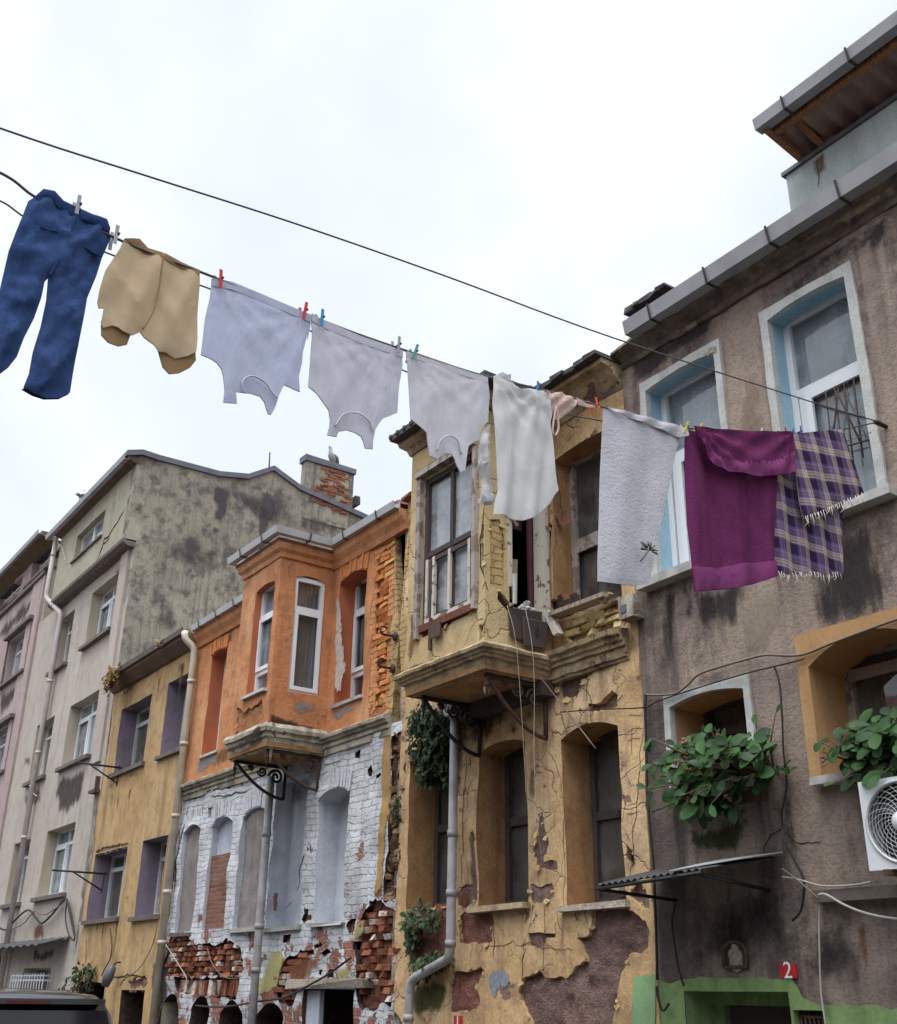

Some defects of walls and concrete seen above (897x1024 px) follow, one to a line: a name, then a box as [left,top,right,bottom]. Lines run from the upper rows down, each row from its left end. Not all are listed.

leakage [214,487,228,532]
leakage [241,492,286,549]
flaking render [310,467,352,515]
crack [474,509,489,616]
peeling [335,599,346,691]
flaking render [553,593,624,641]
leakage [663,589,686,654]
leakage [687,588,777,647]
crack [625,713,644,868]
spalling [164,936,243,998]
spalling [350,835,494,1014]
flaking render [518,884,648,1024]